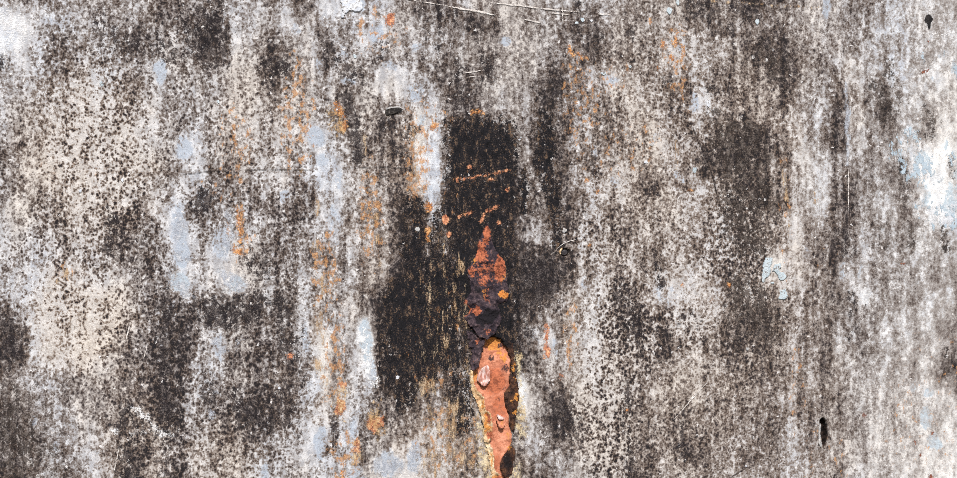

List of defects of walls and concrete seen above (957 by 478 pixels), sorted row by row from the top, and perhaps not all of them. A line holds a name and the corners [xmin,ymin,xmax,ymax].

leakage [255,51,293,78]
leakage [418,0,497,86]
leakage [0,308,58,478]
leakage [109,285,182,478]
leakage [190,247,312,443]
rust [419,378,492,478]
rust [424,202,497,255]
leakage [377,58,568,436]
rust [510,353,529,440]
leakage [609,274,672,371]
leakage [653,258,666,290]
leakage [695,85,784,357]